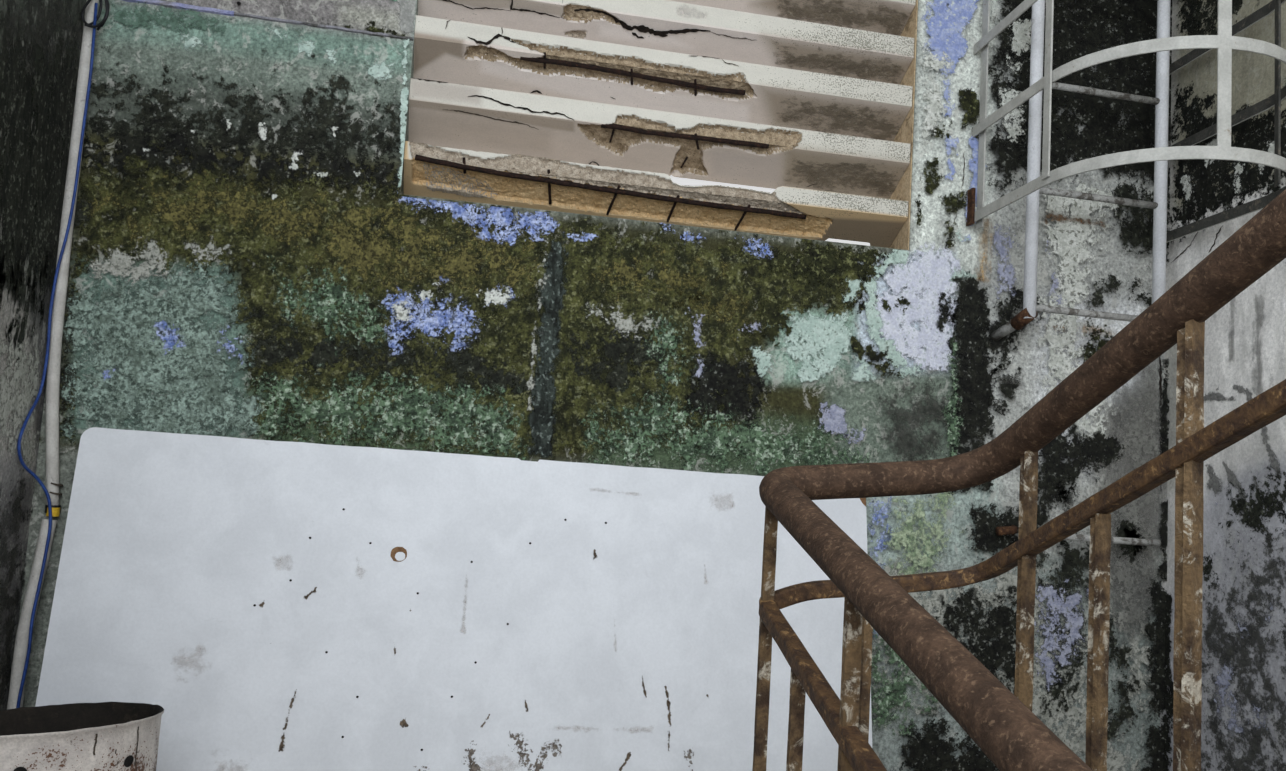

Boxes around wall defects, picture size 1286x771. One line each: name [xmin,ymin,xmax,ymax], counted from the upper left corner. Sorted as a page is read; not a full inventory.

damp [0,0,408,437]
peeling [268,28,338,65]
crack [443,0,751,66]
spalling [368,39,832,410]
spalling [465,4,756,100]
rust [1045,214,1105,227]
damp [986,0,1286,265]
damp [1036,423,1125,529]
damp [932,581,1017,694]
damp [1033,533,1090,717]
damp [1107,500,1174,771]
damp [1201,467,1286,771]